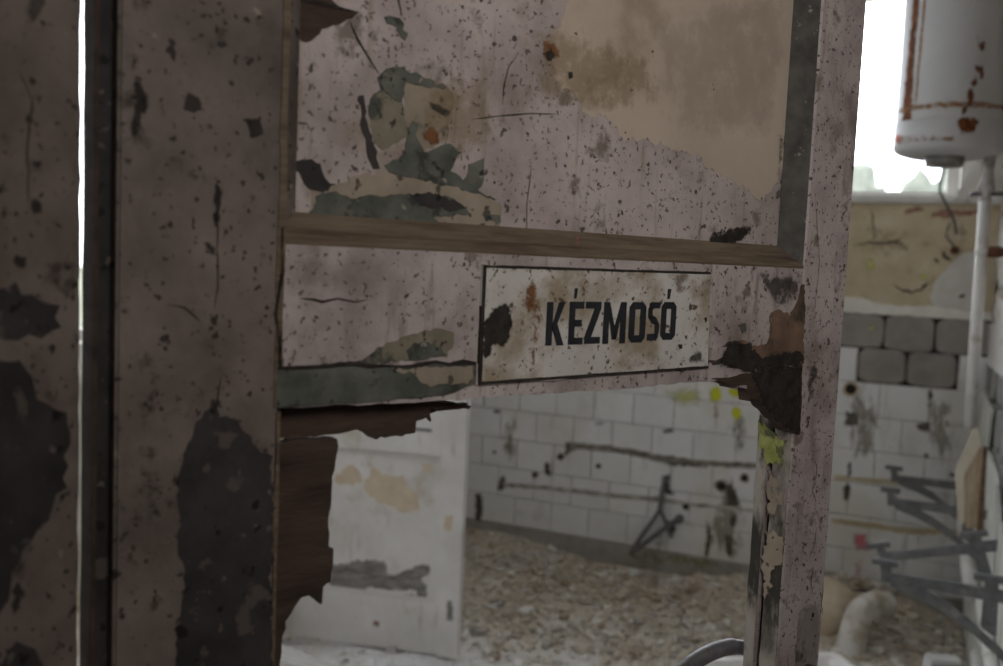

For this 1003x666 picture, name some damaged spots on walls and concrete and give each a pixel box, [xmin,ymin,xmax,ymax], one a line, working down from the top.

peeling [0,360,71,612]
peeling [333,464,420,513]
peeling [175,408,275,666]
peeling [330,559,430,597]
peeling [761,530,784,599]
peeling [0,642,43,666]